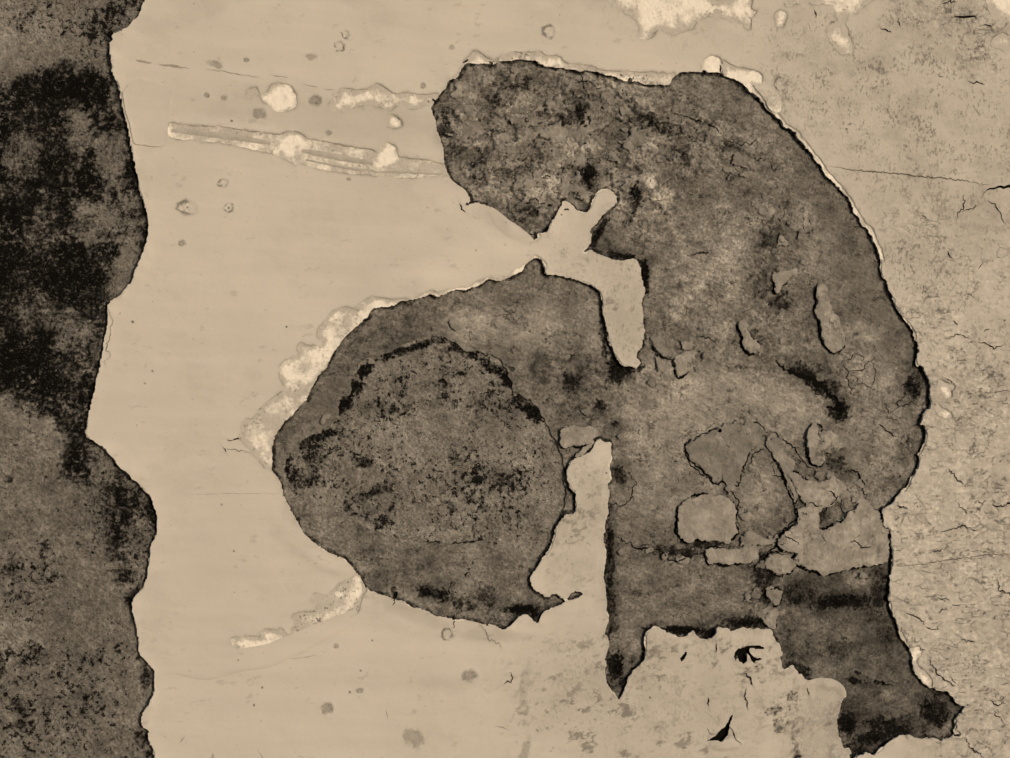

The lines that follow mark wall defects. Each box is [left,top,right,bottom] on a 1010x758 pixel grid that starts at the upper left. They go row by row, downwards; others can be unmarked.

crack [832,166,1010,220]
leakage [0,58,157,595]
peeling [0,0,157,758]
leakage [338,336,547,430]
peeling [231,51,968,758]
crack [775,353,917,436]
crack [951,321,1001,349]
leakage [285,428,346,495]
crack [684,422,1010,574]
crack [907,597,959,686]